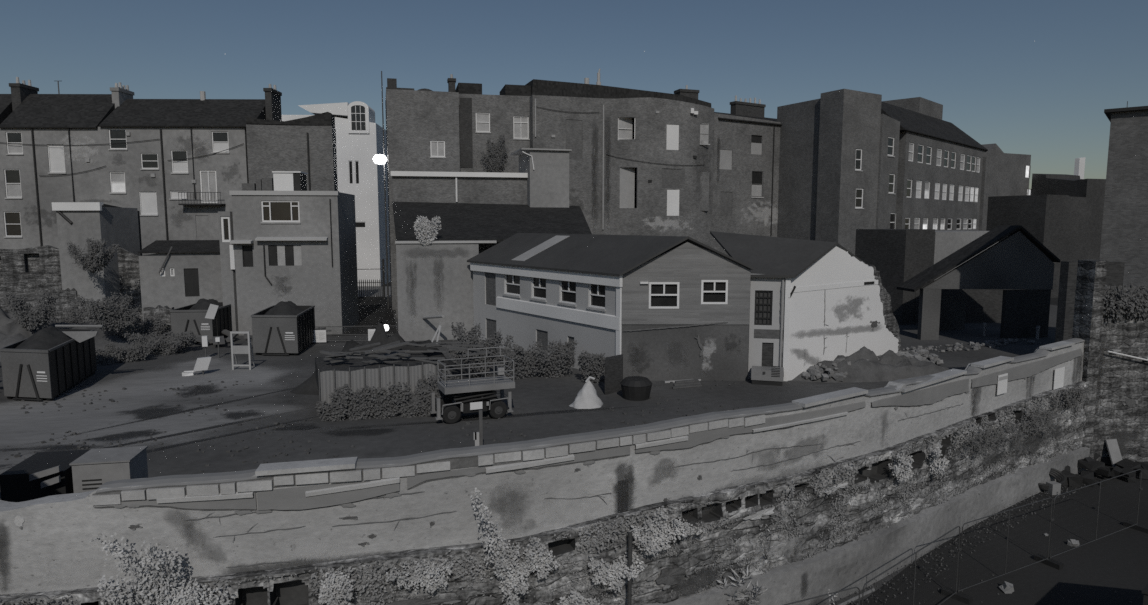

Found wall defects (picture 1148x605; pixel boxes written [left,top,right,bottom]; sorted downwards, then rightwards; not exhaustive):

spalling [869,265,901,351]
water stain [615,465,633,513]
water stain [0,526,8,576]